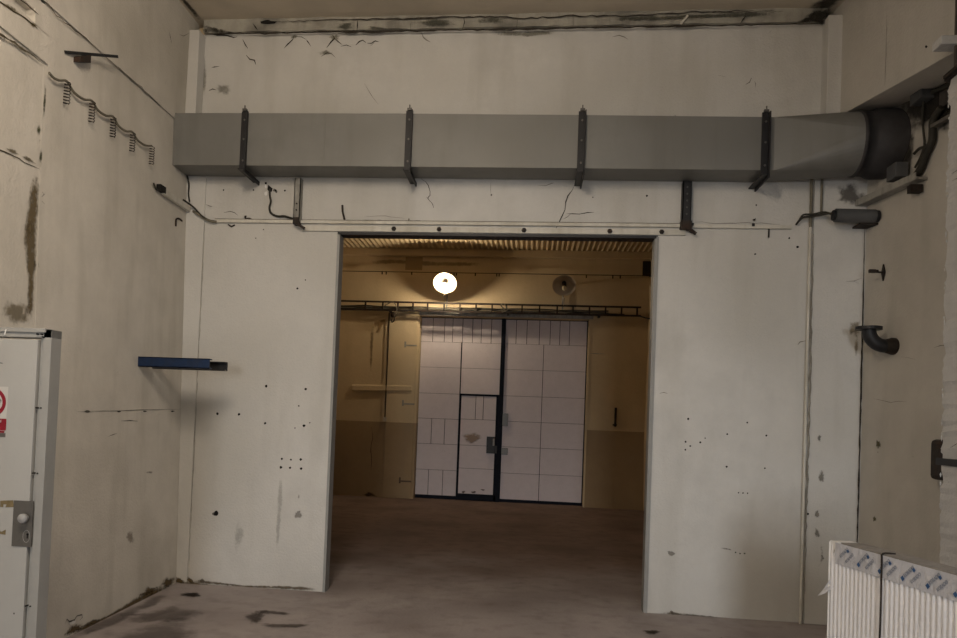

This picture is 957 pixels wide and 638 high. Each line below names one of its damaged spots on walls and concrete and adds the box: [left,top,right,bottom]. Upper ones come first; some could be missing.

leakage [621,12,764,21]
crack [556,187,593,228]
leakage [7,185,38,320]
leakage [67,578,309,634]